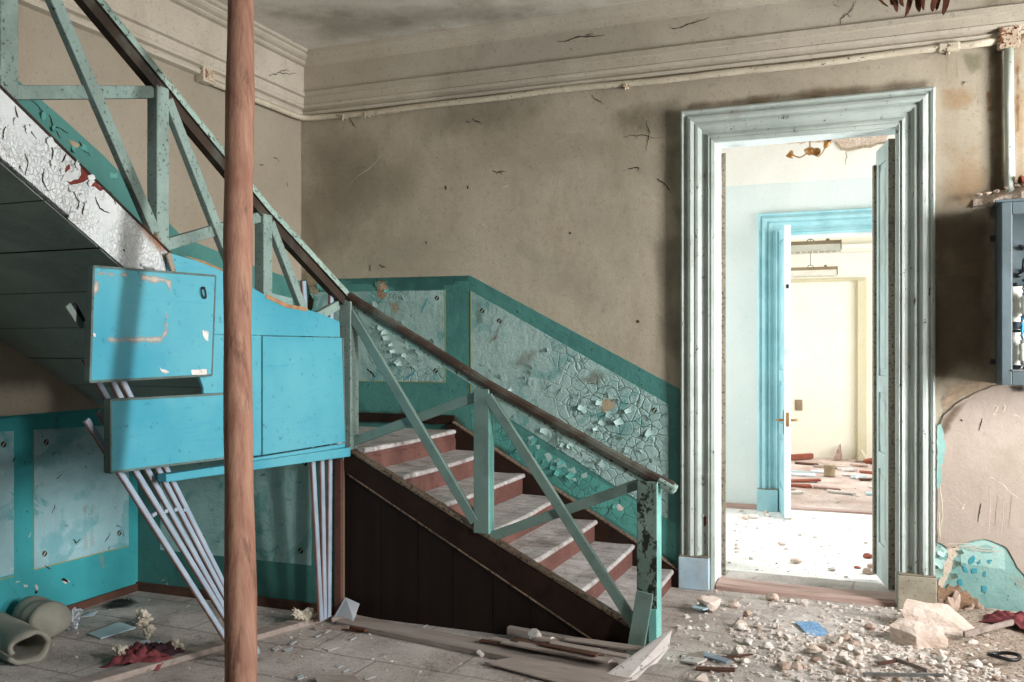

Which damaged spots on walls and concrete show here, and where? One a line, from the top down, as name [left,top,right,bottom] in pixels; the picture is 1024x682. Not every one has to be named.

peeling [2,100,118,214]
crack [628,120,670,190]
spalling [789,135,889,165]
spalling [371,280,389,308]
peeling [372,325,423,380]
peeling [515,428,606,485]
peeling [560,385,662,468]
peeling [936,423,946,489]
peeling [935,539,1024,612]